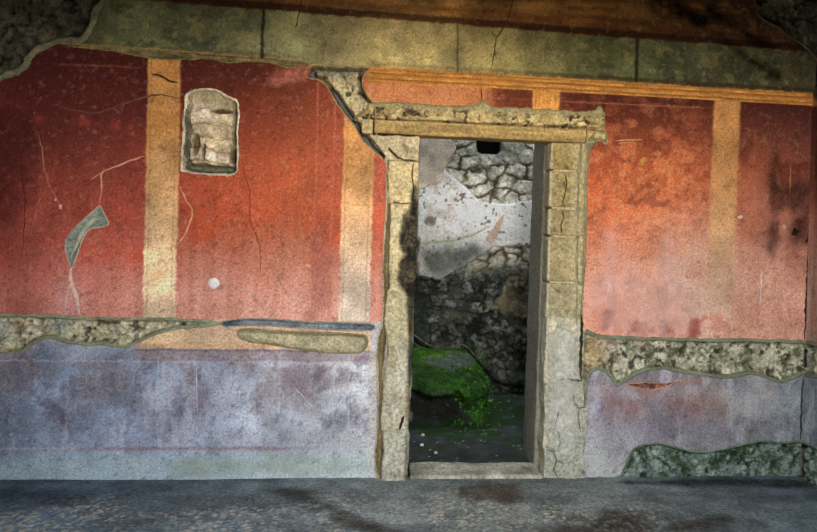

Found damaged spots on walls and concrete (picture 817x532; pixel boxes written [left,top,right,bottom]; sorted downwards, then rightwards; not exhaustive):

crack [491,1,513,70]
flaking render [754,0,817,63]
flaking render [0,0,608,162]
flaking render [180,88,240,176]
peeling [419,138,456,190]
crack [559,173,567,232]
flaking render [0,313,221,355]
crack [546,314,585,478]
rust [625,380,688,390]
flaking render [582,329,817,403]
flaking render [615,439,817,488]